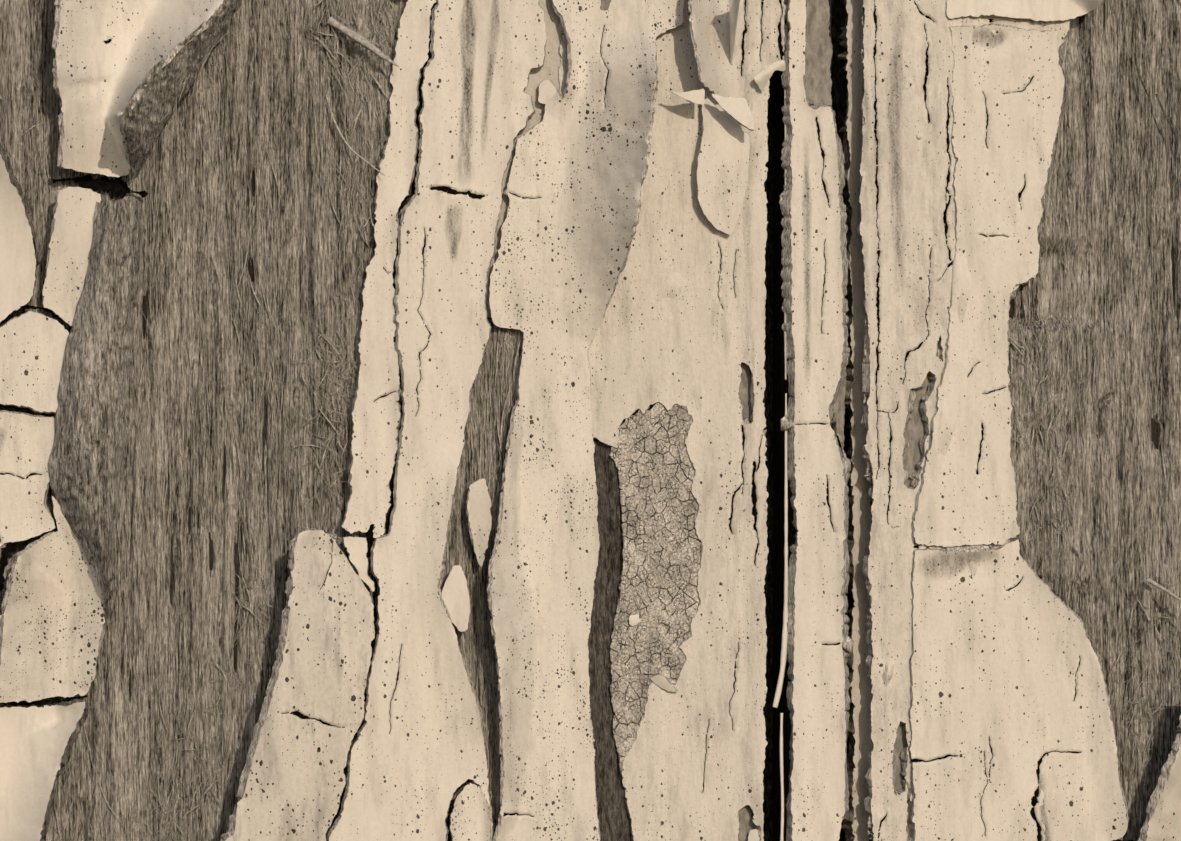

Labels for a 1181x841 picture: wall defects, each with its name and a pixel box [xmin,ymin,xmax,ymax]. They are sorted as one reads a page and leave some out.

peeling [668,0,755,234]
peeling [754,60,786,91]
crack [815,117,830,208]
crack [819,239,827,334]
peeling [0,0,407,841]
crack [282,2,541,841]
peeling [946,0,1181,841]
crack [796,423,843,530]
peeling [440,319,523,841]
crack [911,754,955,762]
crack [980,736,993,835]
crack [1030,751,1081,841]